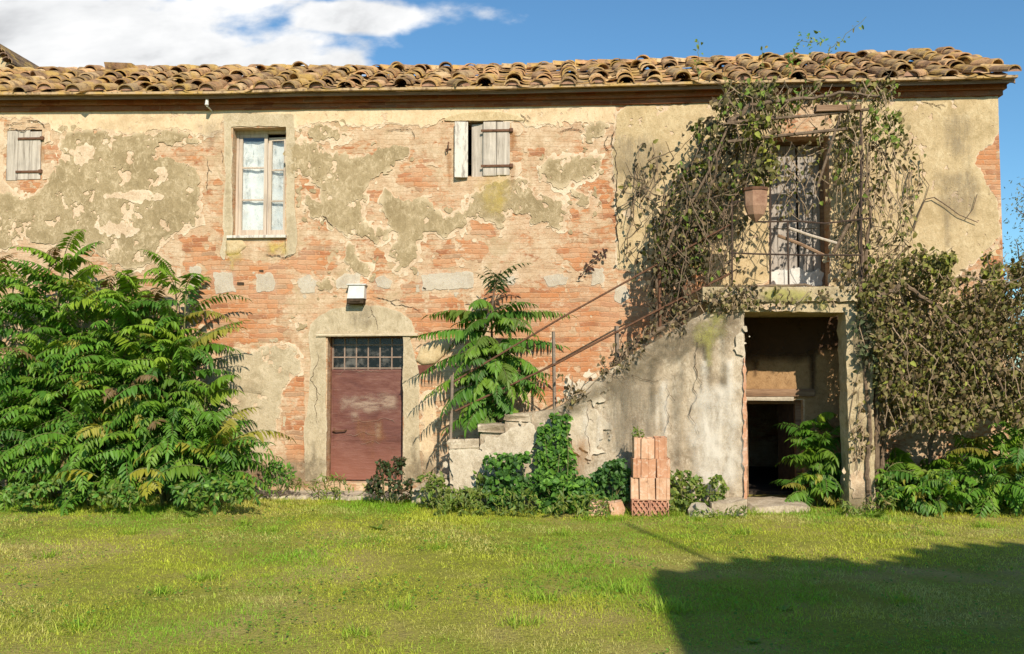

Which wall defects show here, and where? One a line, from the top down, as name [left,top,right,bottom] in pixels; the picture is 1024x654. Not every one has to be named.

peeling [0,96,1003,499]
crack [610,336,702,438]